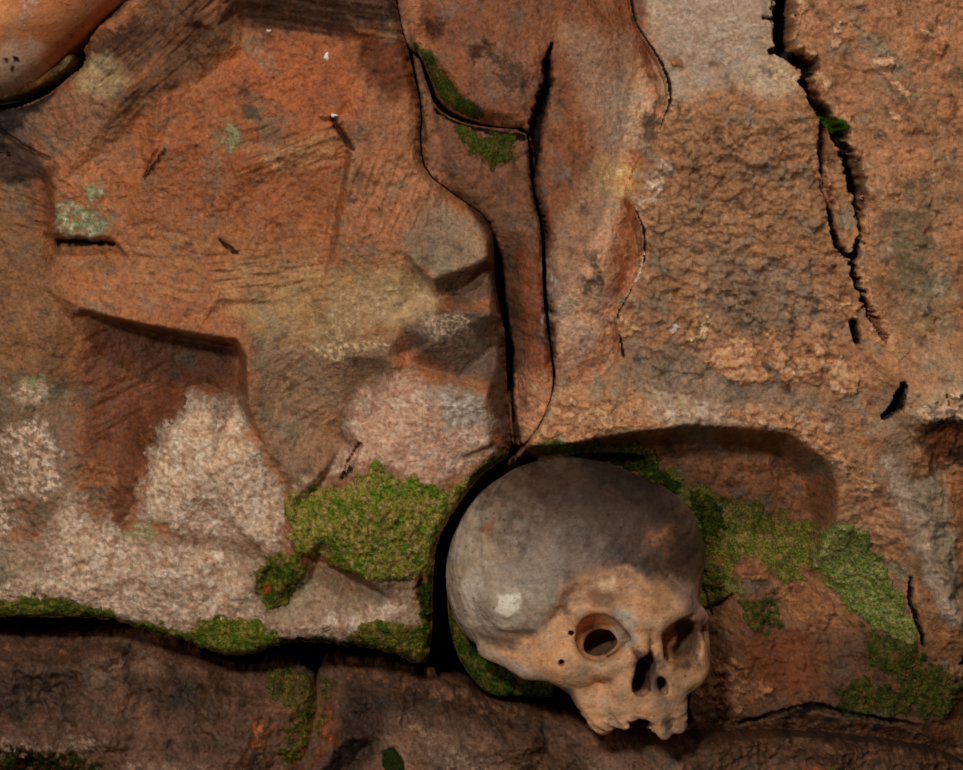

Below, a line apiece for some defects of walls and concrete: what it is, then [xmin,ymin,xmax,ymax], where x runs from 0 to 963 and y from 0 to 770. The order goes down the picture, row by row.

crack [762,0,873,344]
crack [880,382,908,420]